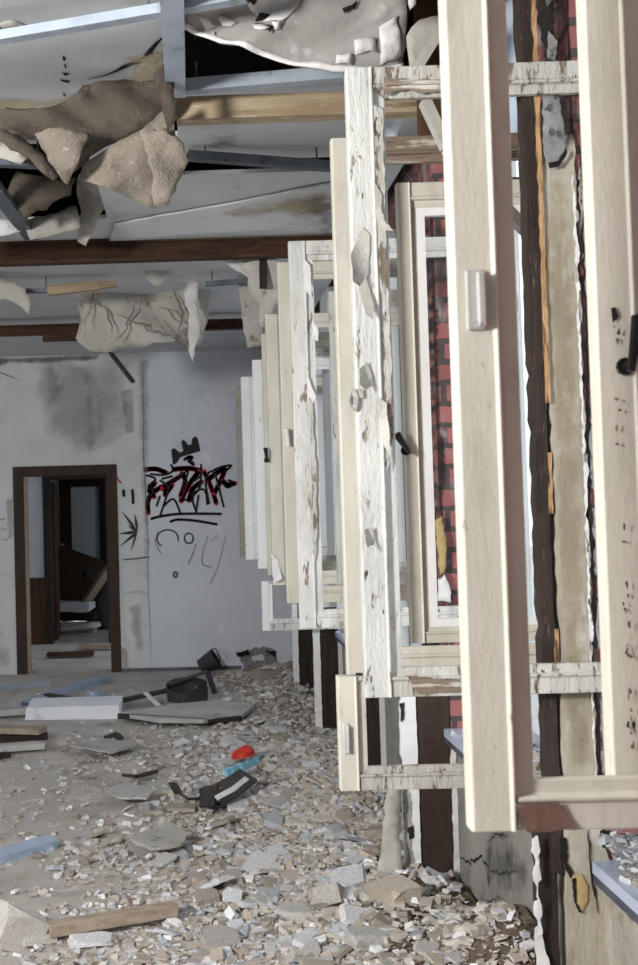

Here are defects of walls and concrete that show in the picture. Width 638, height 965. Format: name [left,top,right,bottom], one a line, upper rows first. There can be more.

peeling [198,15,237,35]
peeling [245,0,301,30]
peeling [335,16,402,65]
peeling [384,78,441,95]
peeling [351,105,394,469]
crack [84,289,188,342]
peeling [364,527,375,548]
peeling [407,676,462,694]